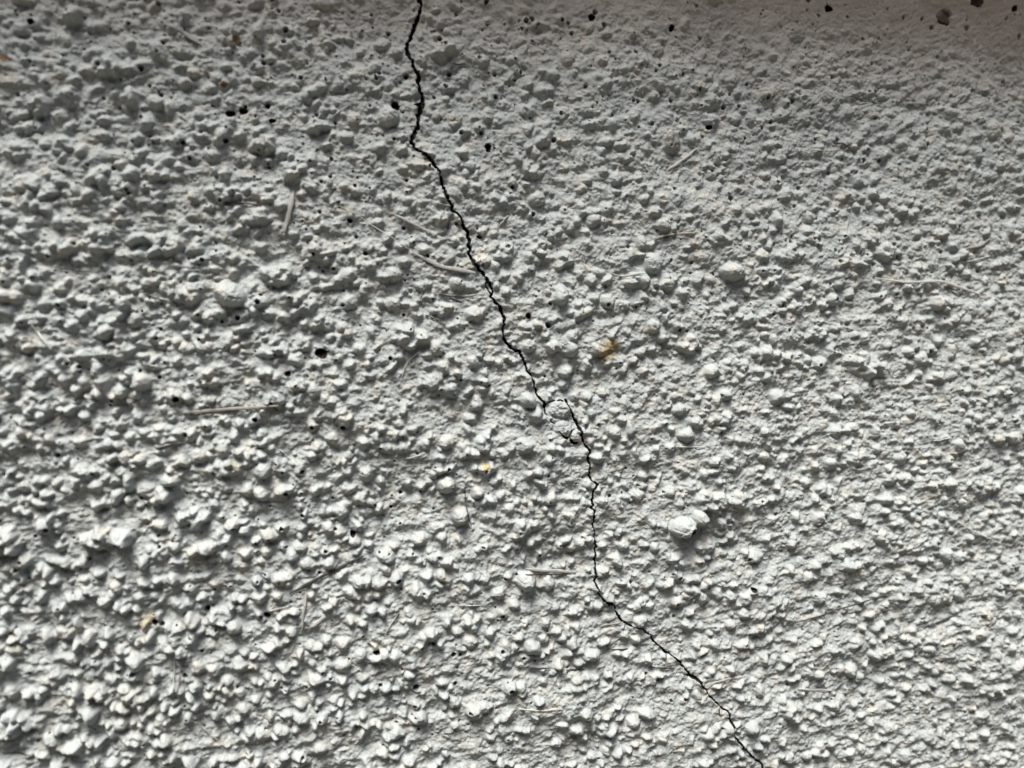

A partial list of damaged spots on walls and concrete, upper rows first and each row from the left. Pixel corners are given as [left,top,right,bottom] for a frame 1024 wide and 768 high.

crack [405,0,764,768]